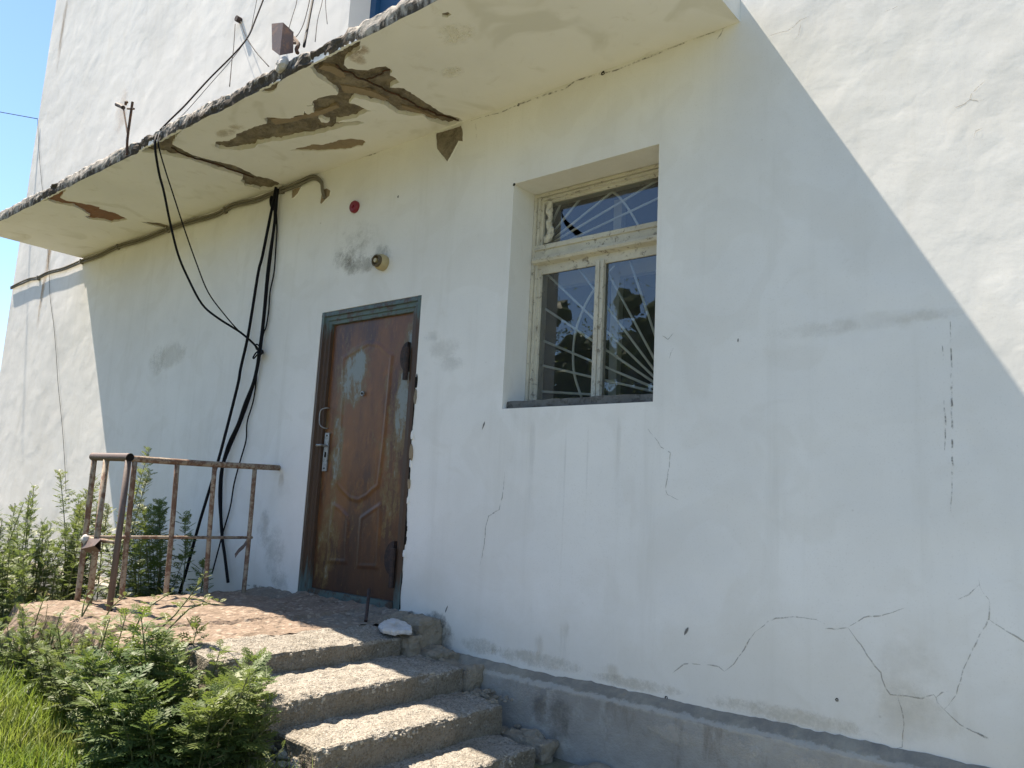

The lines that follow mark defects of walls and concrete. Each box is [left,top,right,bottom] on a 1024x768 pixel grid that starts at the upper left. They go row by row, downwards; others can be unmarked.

spalling [139,39,466,199]
spalling [41,187,169,228]